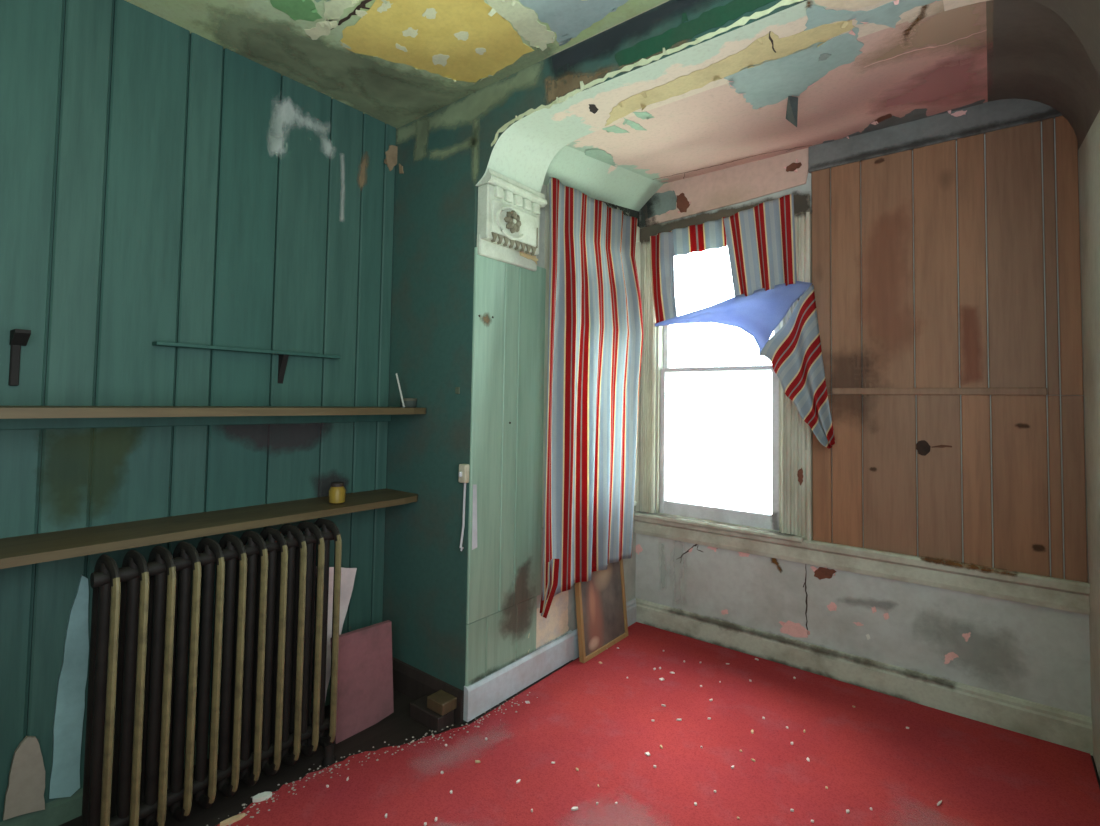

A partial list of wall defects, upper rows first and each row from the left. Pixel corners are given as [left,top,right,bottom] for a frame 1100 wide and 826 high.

peeling [270,0,628,82]
peeling [491,0,940,147]
water stain [215,13,686,180]
peeling [822,99,985,144]
peeling [584,149,616,167]
spalling [784,159,802,172]
peeling [650,190,691,218]
spalling [811,566,836,580]
crack [801,566,809,634]
peeling [779,620,810,638]